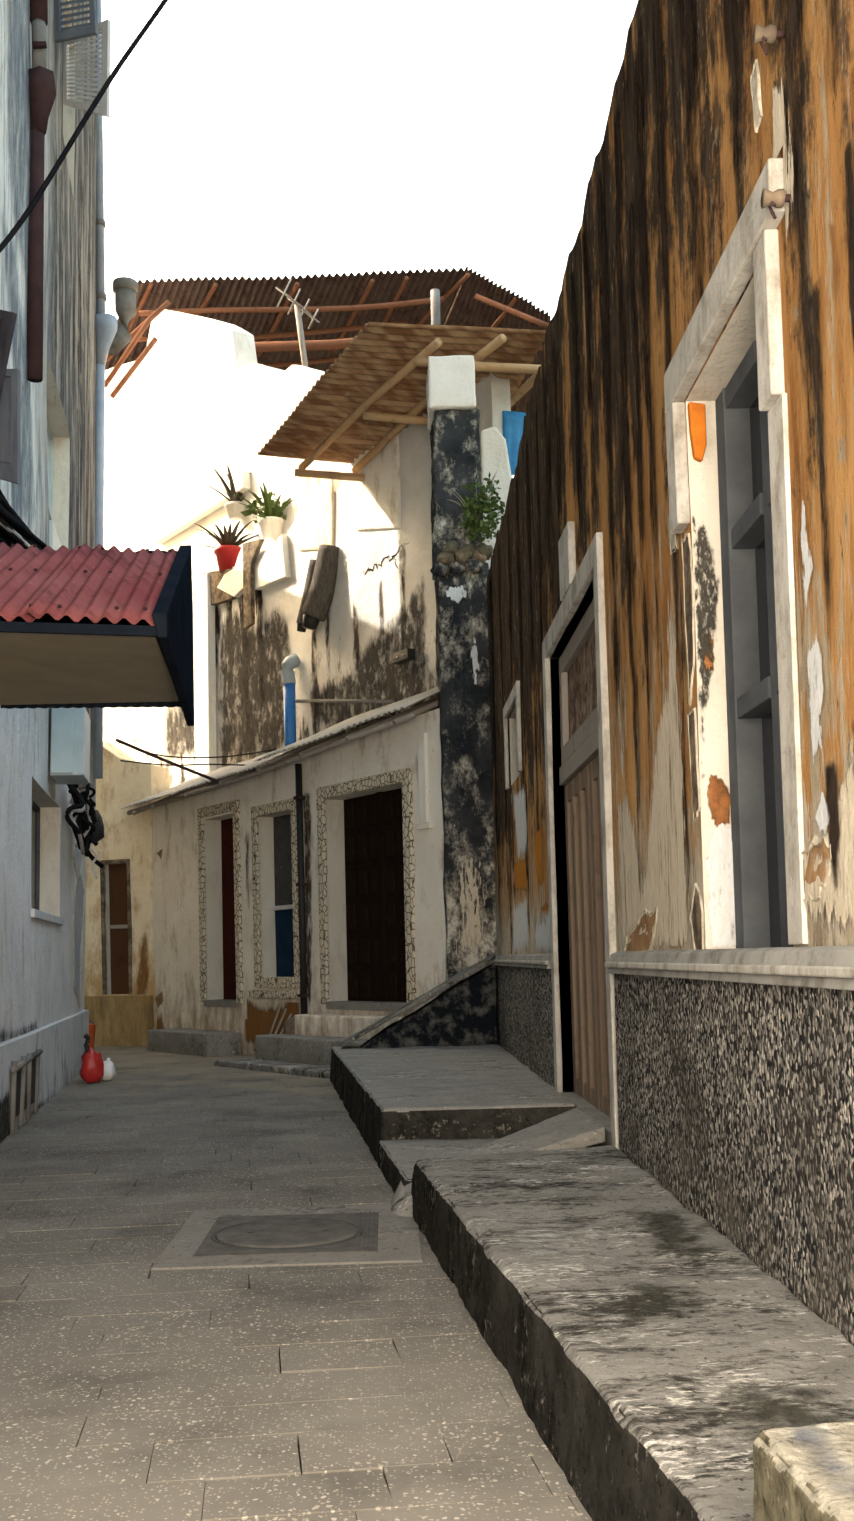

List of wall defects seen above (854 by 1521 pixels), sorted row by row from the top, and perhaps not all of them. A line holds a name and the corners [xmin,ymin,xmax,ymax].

water stain [721,0,740,207]
water stain [825,0,837,86]
water stain [764,0,830,631]
water stain [845,143,854,342]
water stain [453,0,719,935]
water stain [165,707,195,759]
water stain [215,590,290,758]
water stain [312,548,426,727]
peeling [618,515,736,952]
water stain [826,762,854,887]